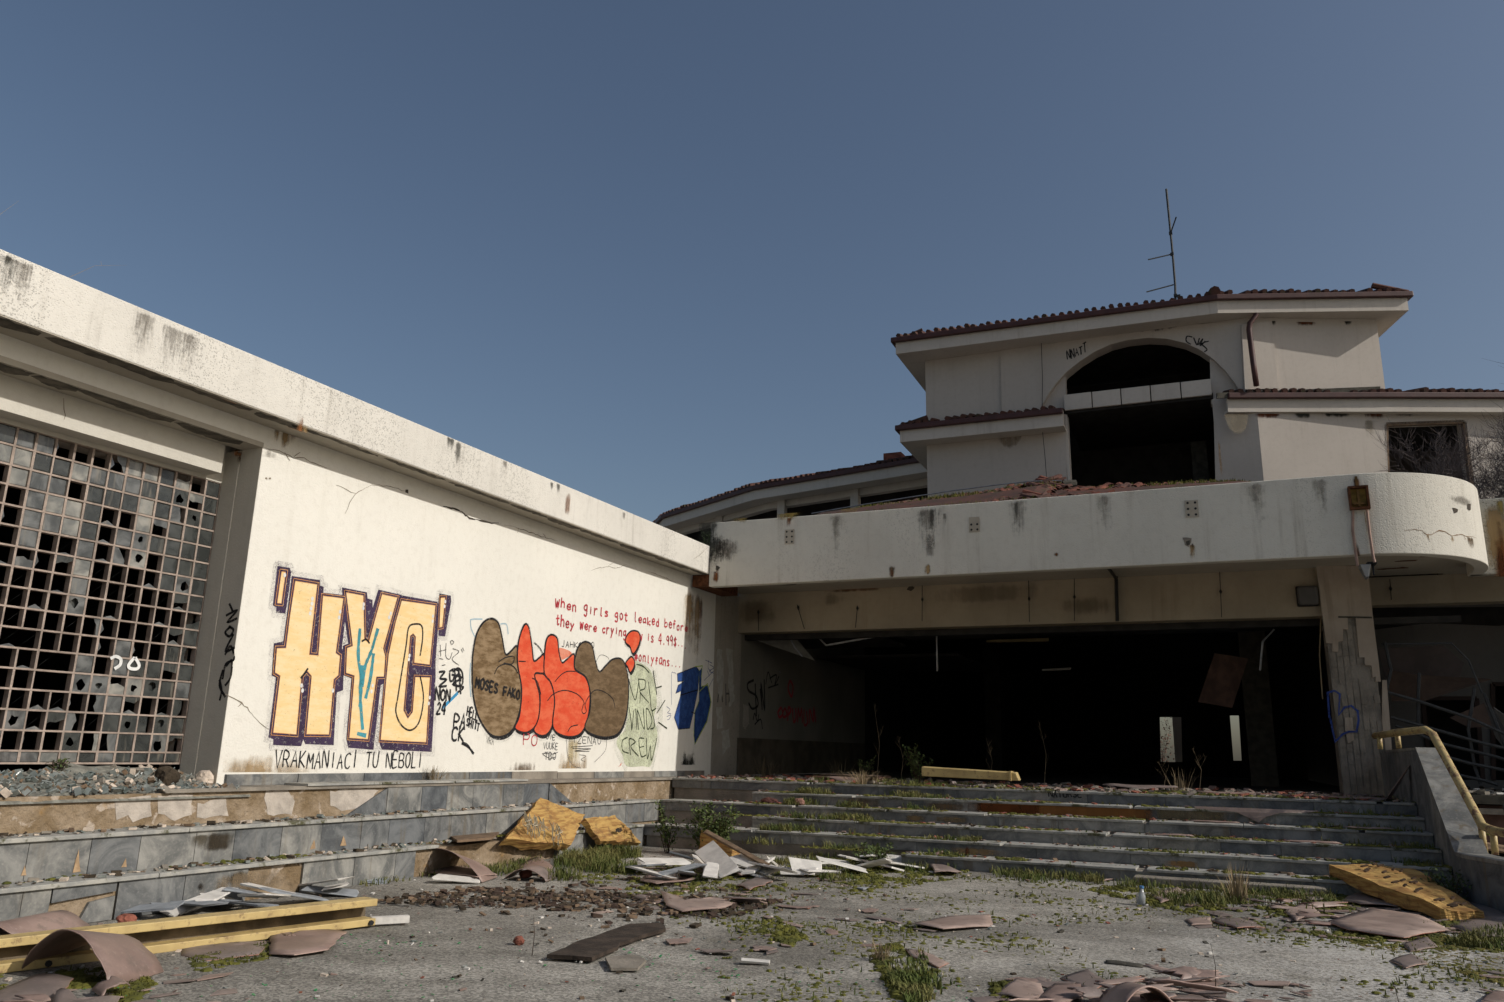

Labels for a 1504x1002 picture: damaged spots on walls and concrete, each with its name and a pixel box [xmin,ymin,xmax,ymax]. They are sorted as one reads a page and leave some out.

crack [267,448,402,513]
crack [443,506,553,540]
damp [699,522,733,560]
crack [1404,529,1475,540]
rust [1468,501,1504,577]